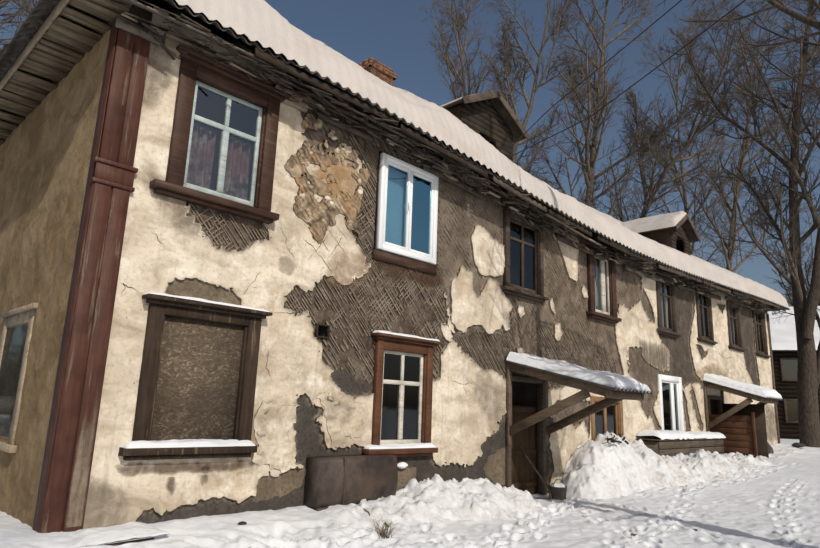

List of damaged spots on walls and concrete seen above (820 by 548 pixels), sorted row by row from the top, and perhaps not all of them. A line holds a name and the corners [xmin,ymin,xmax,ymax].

flaking render [301,112,352,154]
flaking render [165,278,240,306]
flaking render [437,145,706,432]
flaking render [740,305,759,385]
flaking render [331,369,373,397]
flaking render [135,393,363,524]
flaking render [397,415,505,488]